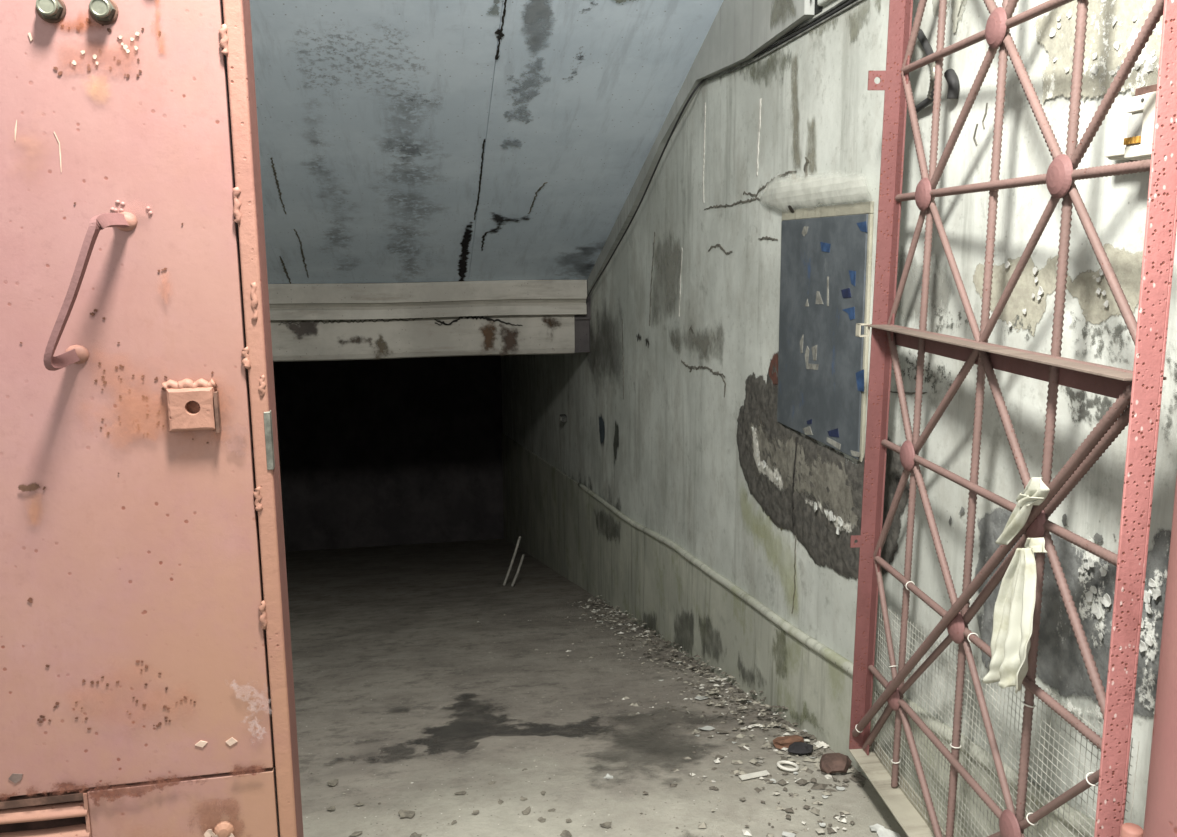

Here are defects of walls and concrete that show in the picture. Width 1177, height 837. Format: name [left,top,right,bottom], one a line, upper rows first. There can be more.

crack [495,0,507,60]
water stain [504,0,552,124]
crack [474,139,485,220]
crack [528,182,548,214]
crack [704,171,796,210]
crack [681,360,726,397]
flaking render [736,0,1164,837]
water stain [674,613,719,661]